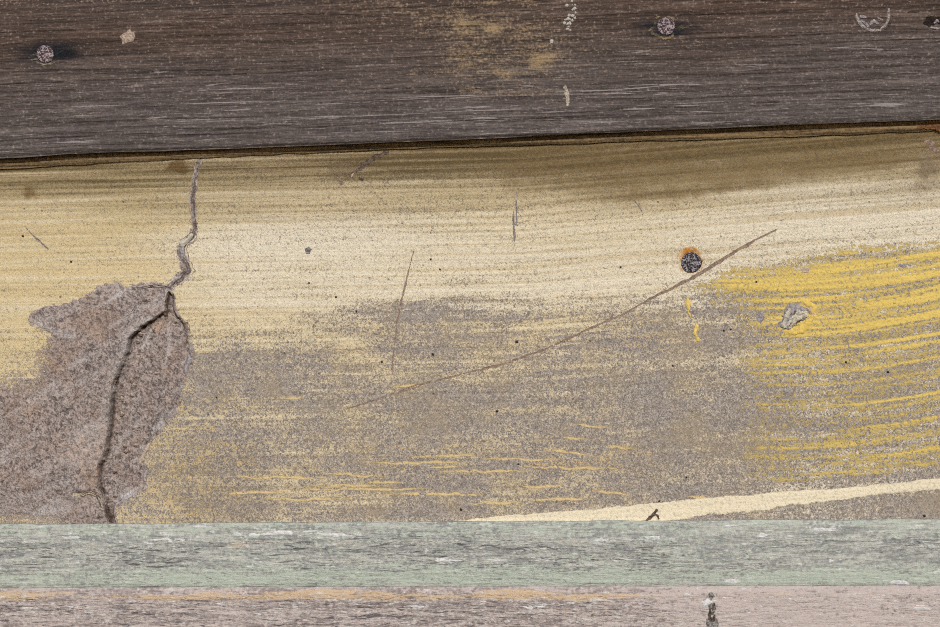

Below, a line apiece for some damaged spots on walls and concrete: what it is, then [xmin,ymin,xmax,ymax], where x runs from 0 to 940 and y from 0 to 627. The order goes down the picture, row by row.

crack [127,158,202,316]
spalling [92,284,194,554]
crack [77,491,113,523]